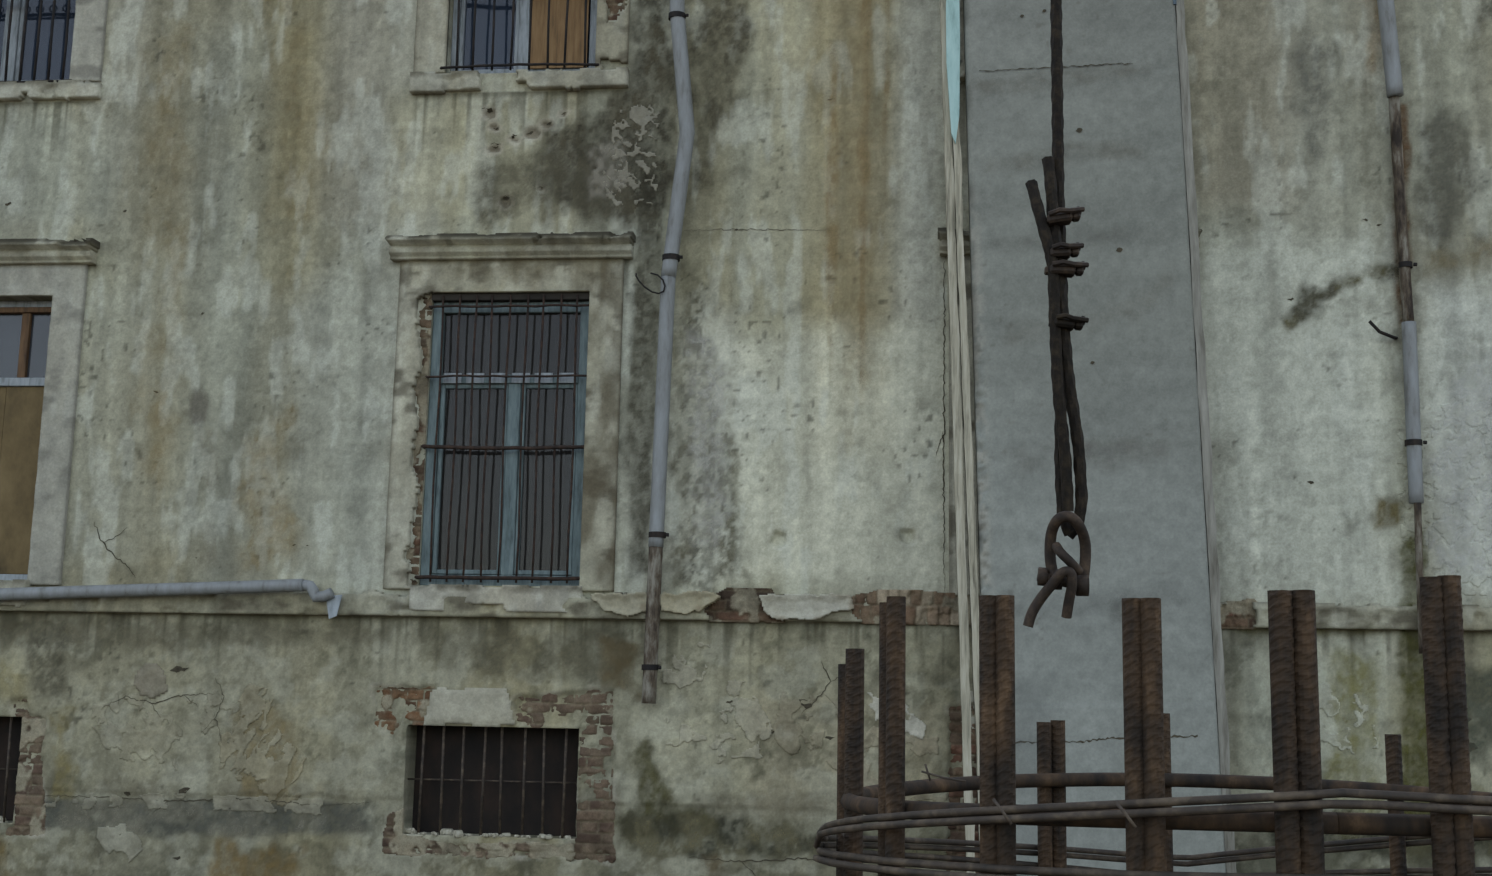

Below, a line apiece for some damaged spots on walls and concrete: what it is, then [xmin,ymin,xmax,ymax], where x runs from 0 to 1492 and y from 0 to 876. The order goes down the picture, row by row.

leakage [691,0,750,82]
leakage [530,0,674,241]
flaking render [594,105,660,206]
flaking render [406,295,432,585]
leakage [629,266,657,570]
flaking render [590,591,721,617]
flaking render [759,593,854,622]
flaking render [5,699,190,862]
flaking render [375,686,435,734]
flaking render [382,689,616,863]
flaking render [863,692,879,787]
flaking render [905,691,978,803]